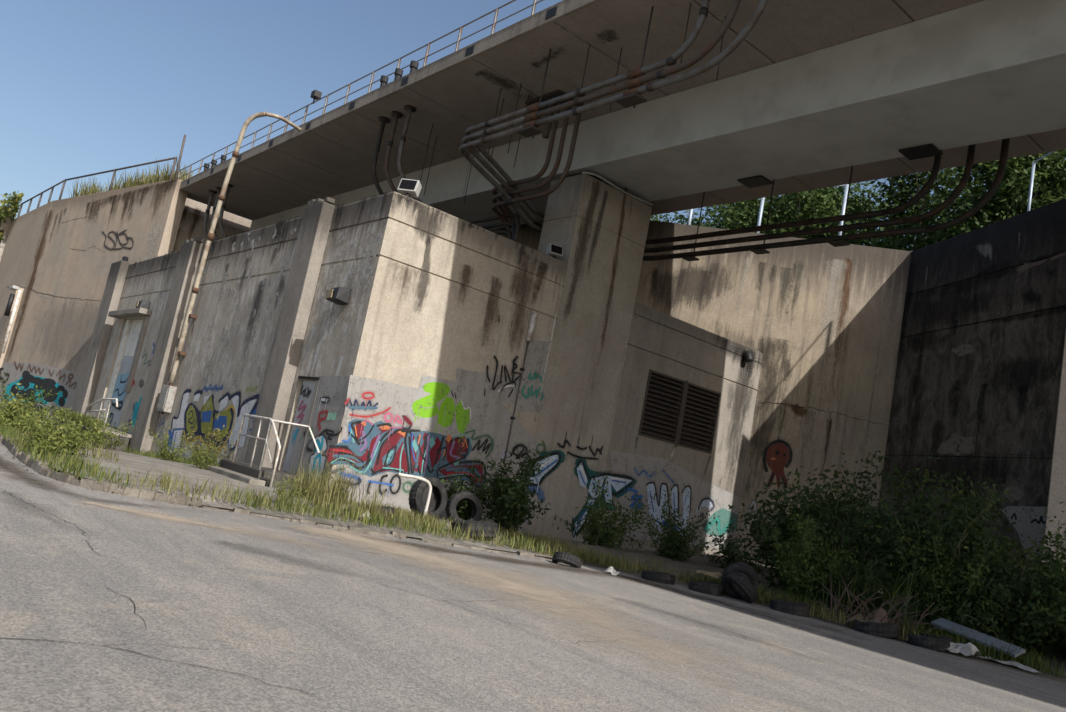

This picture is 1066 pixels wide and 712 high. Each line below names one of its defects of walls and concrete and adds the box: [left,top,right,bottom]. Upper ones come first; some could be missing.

damp [86,179,176,218]
crack [1,286,101,301]
damp [358,191,447,306]
damp [461,265,471,293]
damp [484,244,547,340]
damp [565,181,608,312]
damp [652,265,726,307]
damp [759,262,801,303]
rust [837,259,852,330]
damp [900,264,1066,388]